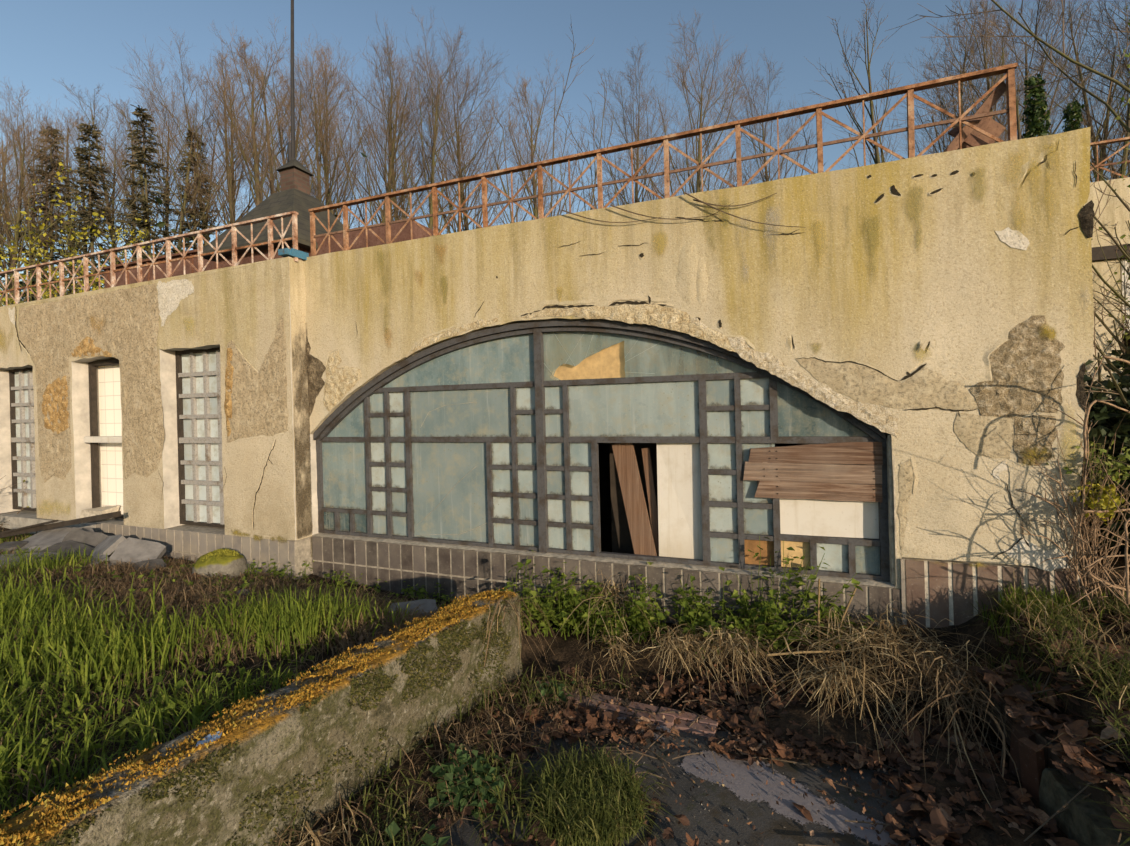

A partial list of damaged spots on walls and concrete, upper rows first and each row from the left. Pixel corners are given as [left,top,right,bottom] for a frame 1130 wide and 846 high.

flaking render [7,279,194,483]
flaking render [224,311,289,446]
flaking render [522,301,898,437]
crack [784,336,926,381]
crack [905,406,976,418]
flaking render [954,313,1065,480]
spalling [1077,363,1087,412]